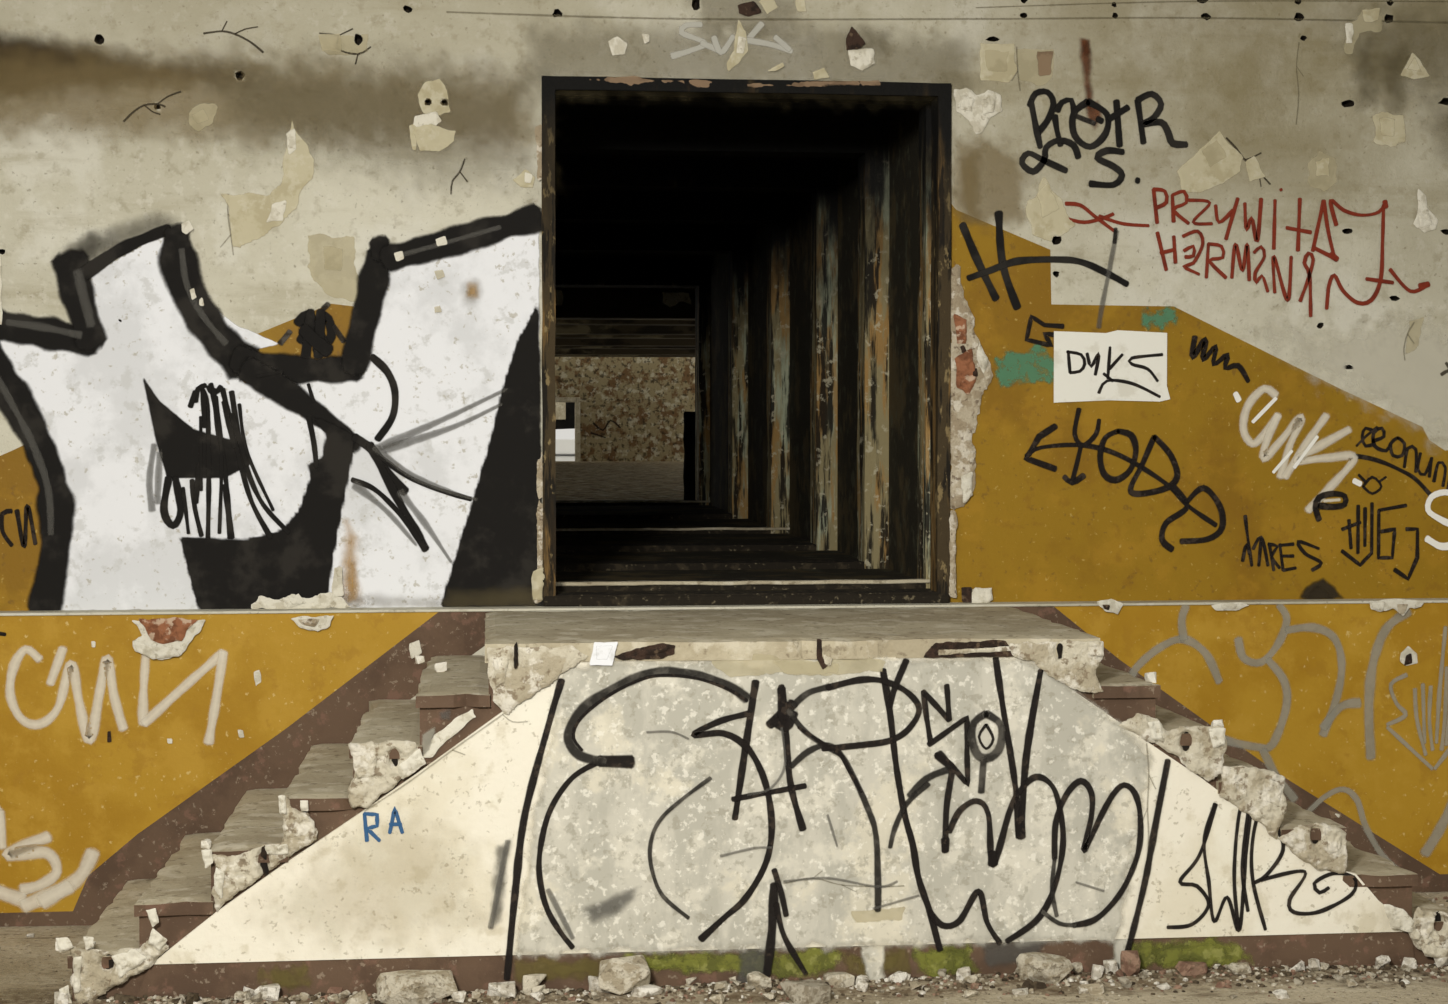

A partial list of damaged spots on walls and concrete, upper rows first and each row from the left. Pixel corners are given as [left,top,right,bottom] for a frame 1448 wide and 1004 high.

water stain [0,41,216,95]
flaking render [409,79,456,151]
spalling [949,264,993,603]
spalling [132,617,205,660]
peeling [409,640,422,658]
spalling [924,639,1104,693]
spalling [1370,599,1424,616]
spalling [348,709,476,808]
spalling [1119,713,1348,874]
spalling [201,795,318,912]
spalling [56,908,169,1003]
spalling [1384,893,1448,958]